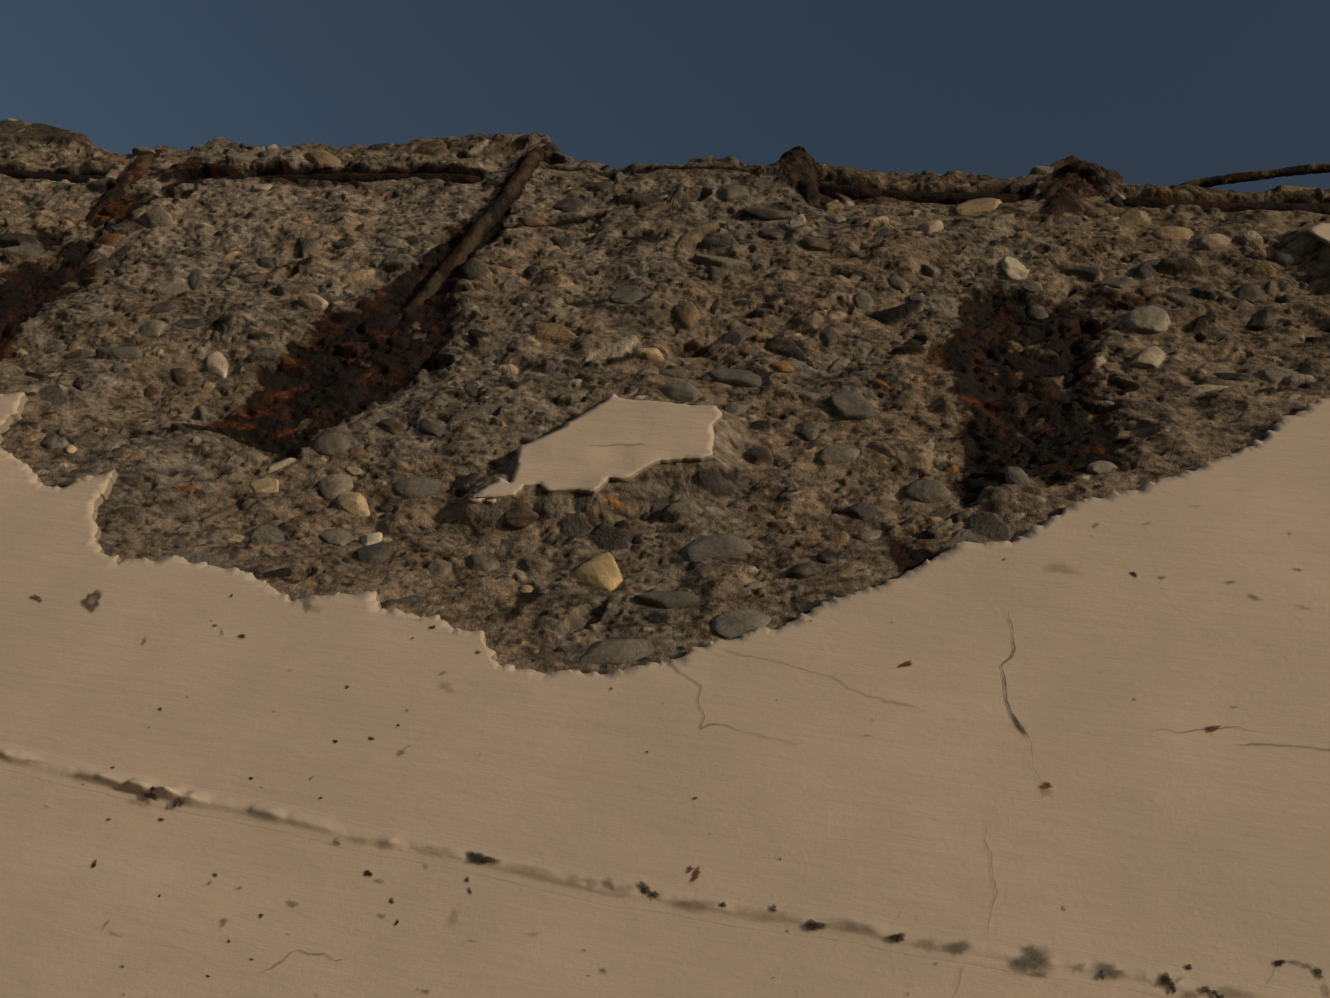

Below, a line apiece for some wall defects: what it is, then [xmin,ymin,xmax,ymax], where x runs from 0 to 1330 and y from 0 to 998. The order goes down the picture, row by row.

rust [0,168,147,362]
rust [153,151,549,461]
spalling [0,118,1330,674]
rust [780,146,919,209]
rust [929,286,1130,505]
rust [1025,155,1123,223]
rust [1100,290,1160,311]
crack [1001,614,1029,738]